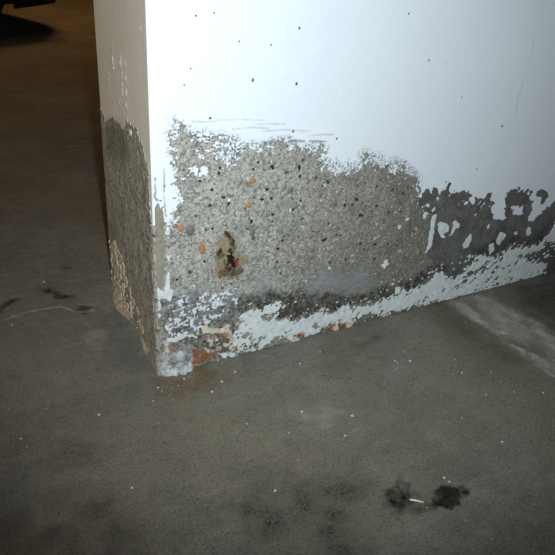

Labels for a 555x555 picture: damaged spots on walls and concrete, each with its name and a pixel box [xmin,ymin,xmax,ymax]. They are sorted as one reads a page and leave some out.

spalling [100,107,555,376]